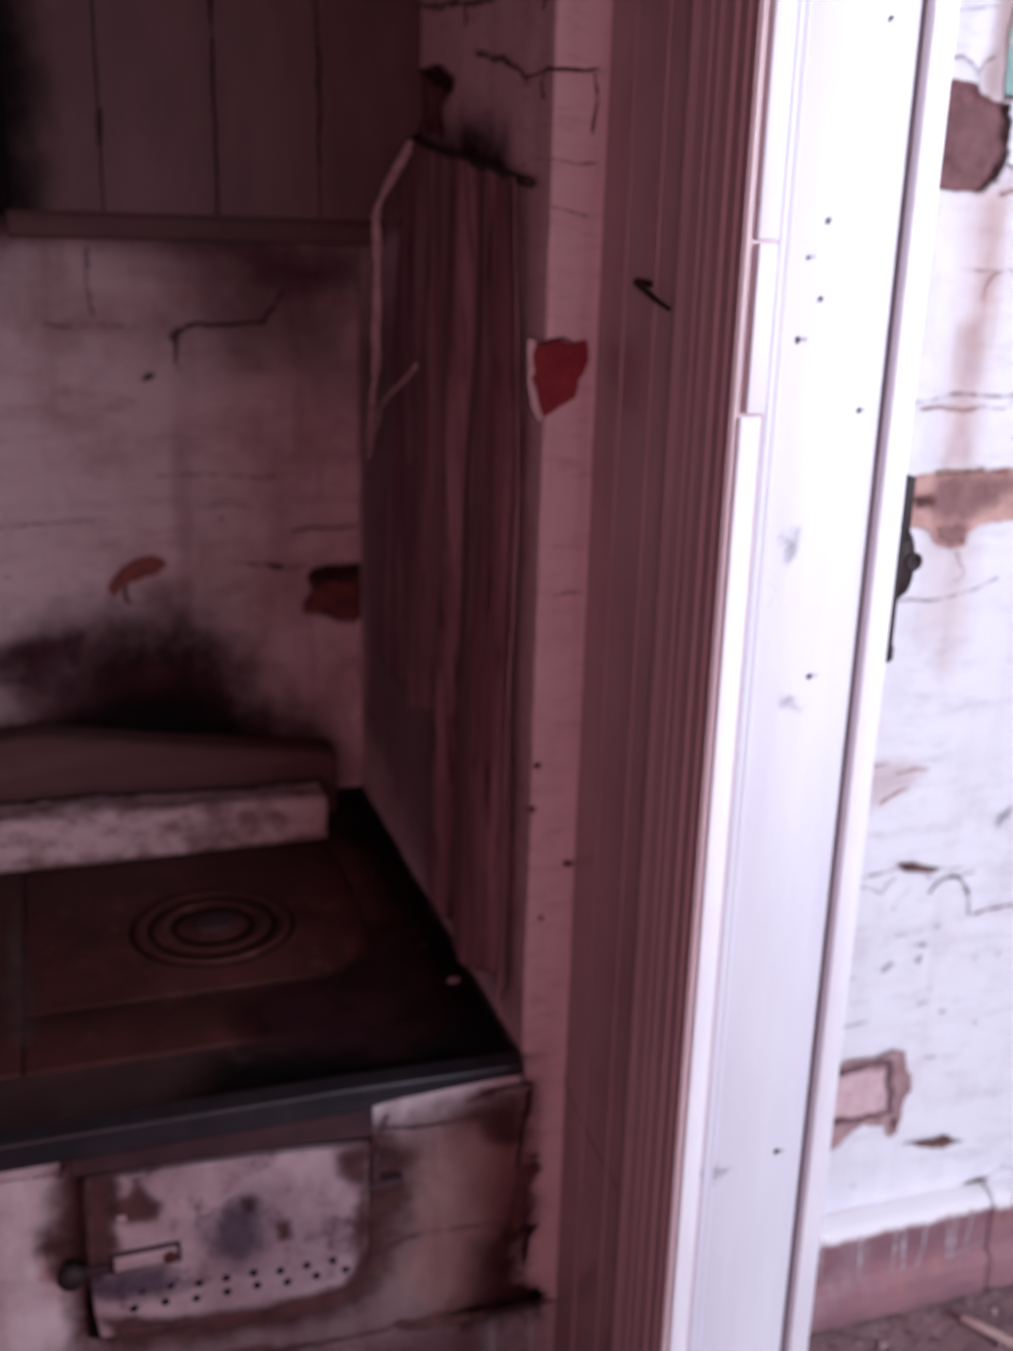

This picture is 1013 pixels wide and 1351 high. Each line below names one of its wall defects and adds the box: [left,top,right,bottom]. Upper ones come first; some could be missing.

crack [418,0,600,165]
flaking render [939,79,1013,193]
crack [975,270,1013,282]
crack [170,289,284,369]
flaking render [528,337,589,421]
flaking render [911,467,1013,548]
peeling [107,555,166,605]
flaking render [303,563,362,622]
leakage [0,639,70,671]
leakage [76,663,239,735]
crack [861,862,1013,915]
flaking render [830,1050,962,1150]